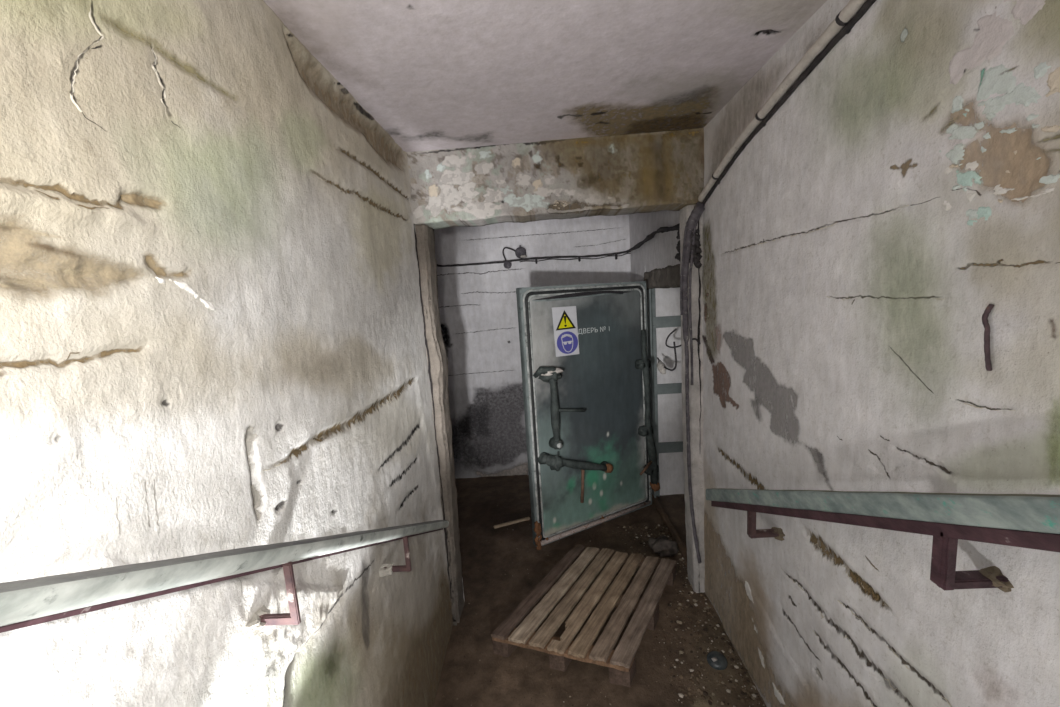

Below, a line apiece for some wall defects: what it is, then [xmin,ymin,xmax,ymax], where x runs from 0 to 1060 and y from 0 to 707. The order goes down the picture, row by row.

crack [11,180,123,210]
crack [70,2,105,131]
peeling [413,151,622,219]
water stain [558,90,712,200]
peeling [939,0,1060,226]
spalling [0,220,215,310]
crack [0,349,139,376]
crack [263,149,521,599]
crack [695,269,703,421]
water stain [702,227,825,475]
crack [869,436,951,477]
crack [781,532,952,707]